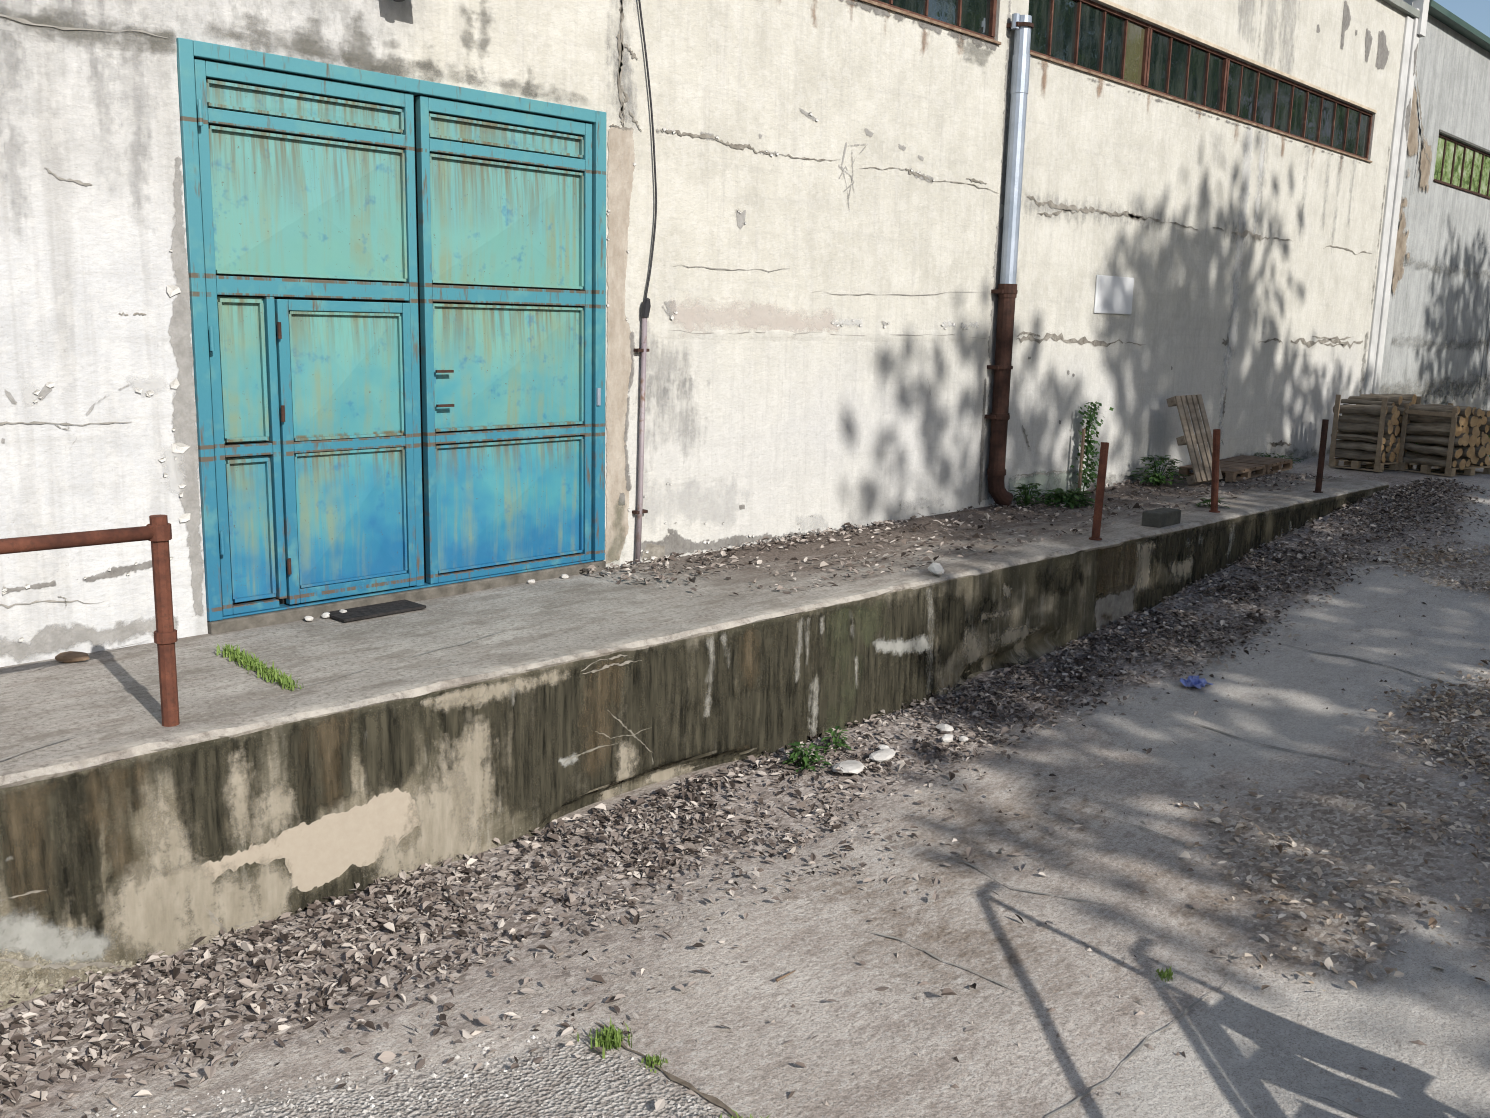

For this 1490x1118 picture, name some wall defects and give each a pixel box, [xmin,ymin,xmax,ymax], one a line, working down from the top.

crack [610,0,1372,255]
flaking render [1341,1,1389,69]
flaking render [941,1,1086,504]
damp [0,737,259,937]
flaking render [0,723,494,1010]
damp [289,865,383,914]
spalling [423,670,566,711]
damp [289,587,998,824]
flaking render [602,744,694,800]